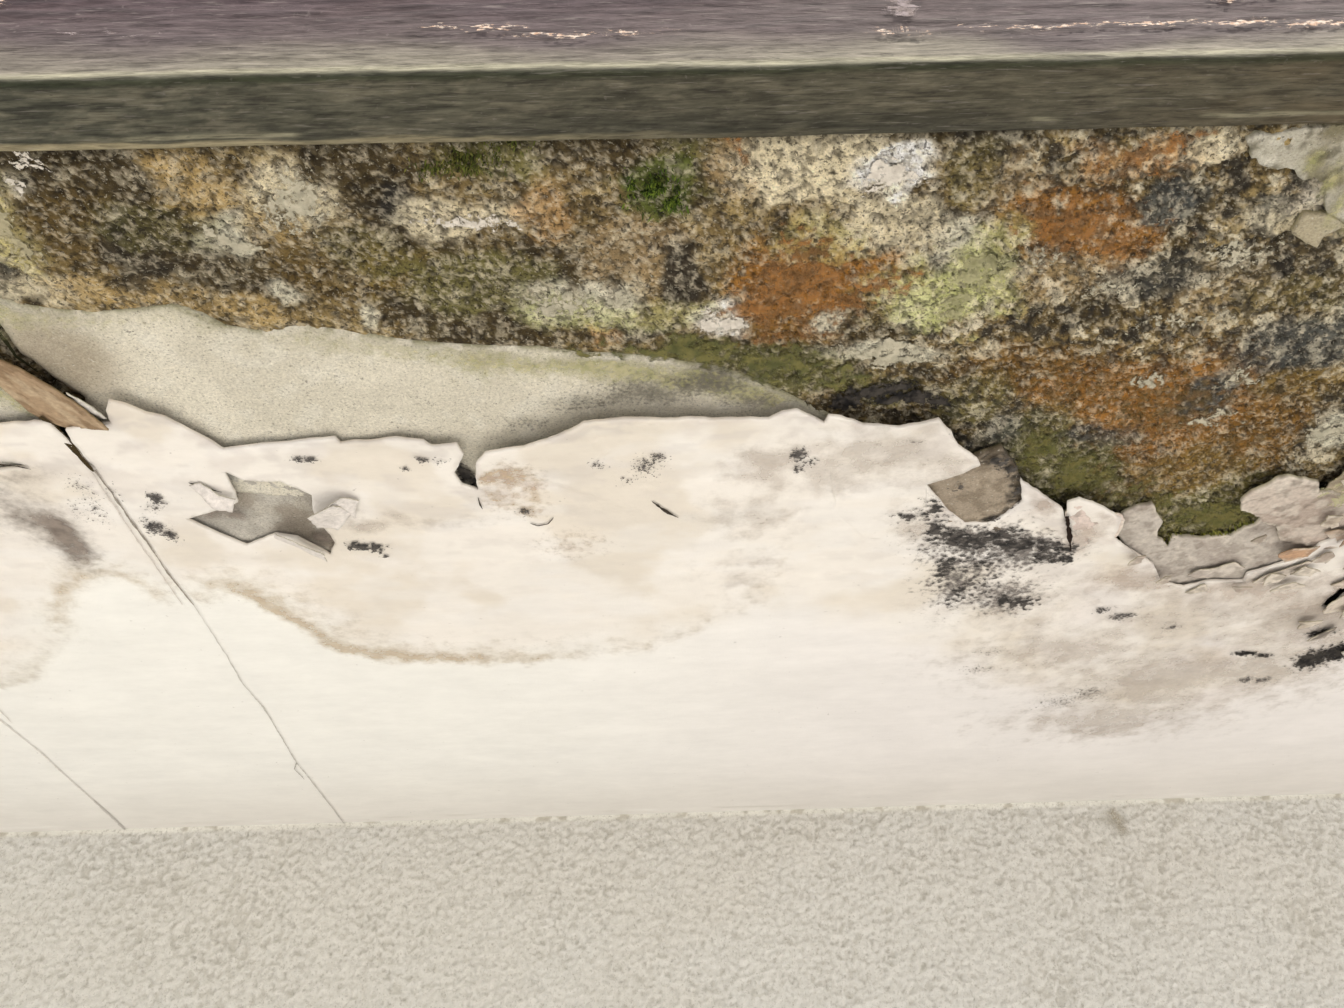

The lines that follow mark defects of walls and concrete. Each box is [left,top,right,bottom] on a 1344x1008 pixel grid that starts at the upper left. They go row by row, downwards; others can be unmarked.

crack [0,333,38,372]
water stain [510,366,785,431]
spalling [0,123,1344,642]
water stain [11,475,124,561]
water stain [139,491,179,543]
water stain [312,524,392,558]
water stain [402,457,536,491]
water stain [620,453,672,483]
water stain [889,457,1096,615]
crack [39,416,344,823]
water stain [1031,583,1344,734]
crack [0,710,125,830]